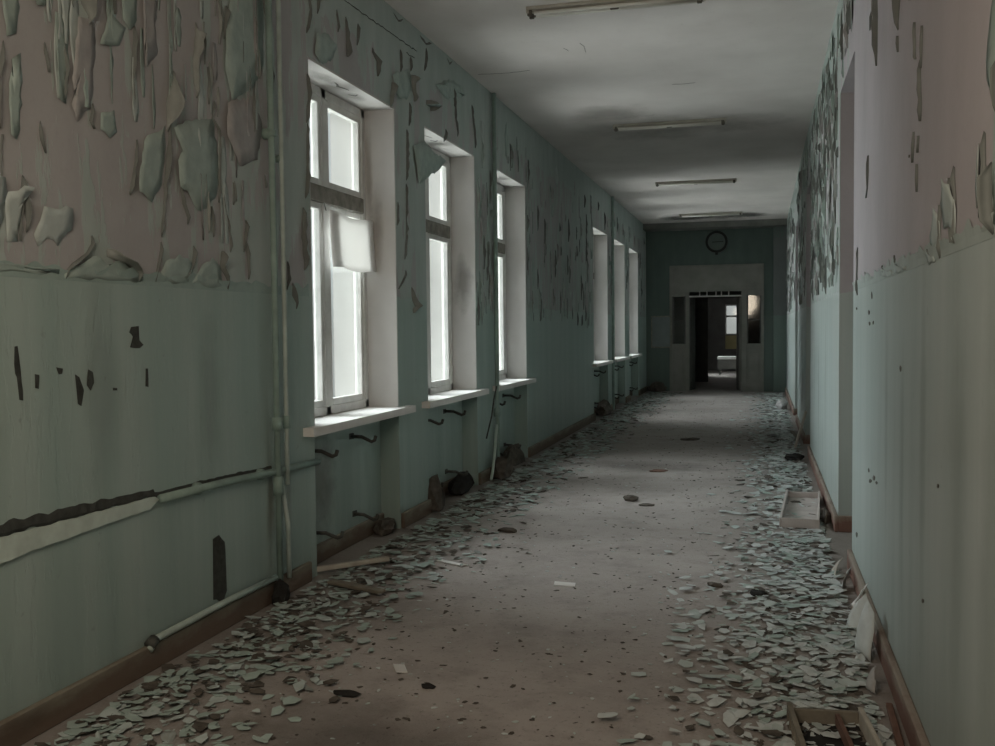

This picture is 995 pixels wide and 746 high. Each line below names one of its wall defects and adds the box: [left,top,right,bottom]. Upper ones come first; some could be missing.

peeling [869,0,878,66]
peeling [0,0,309,309]
peeling [301,73,312,270]
peeling [390,36,466,259]
peeling [471,106,494,326]
peeling [496,119,645,328]
peeling [786,0,852,312]
peeling [14,346,23,401]
peeling [75,370,94,406]
spalling [0,497,159,564]
spalling [213,535,227,601]
peeling [847,582,876,694]